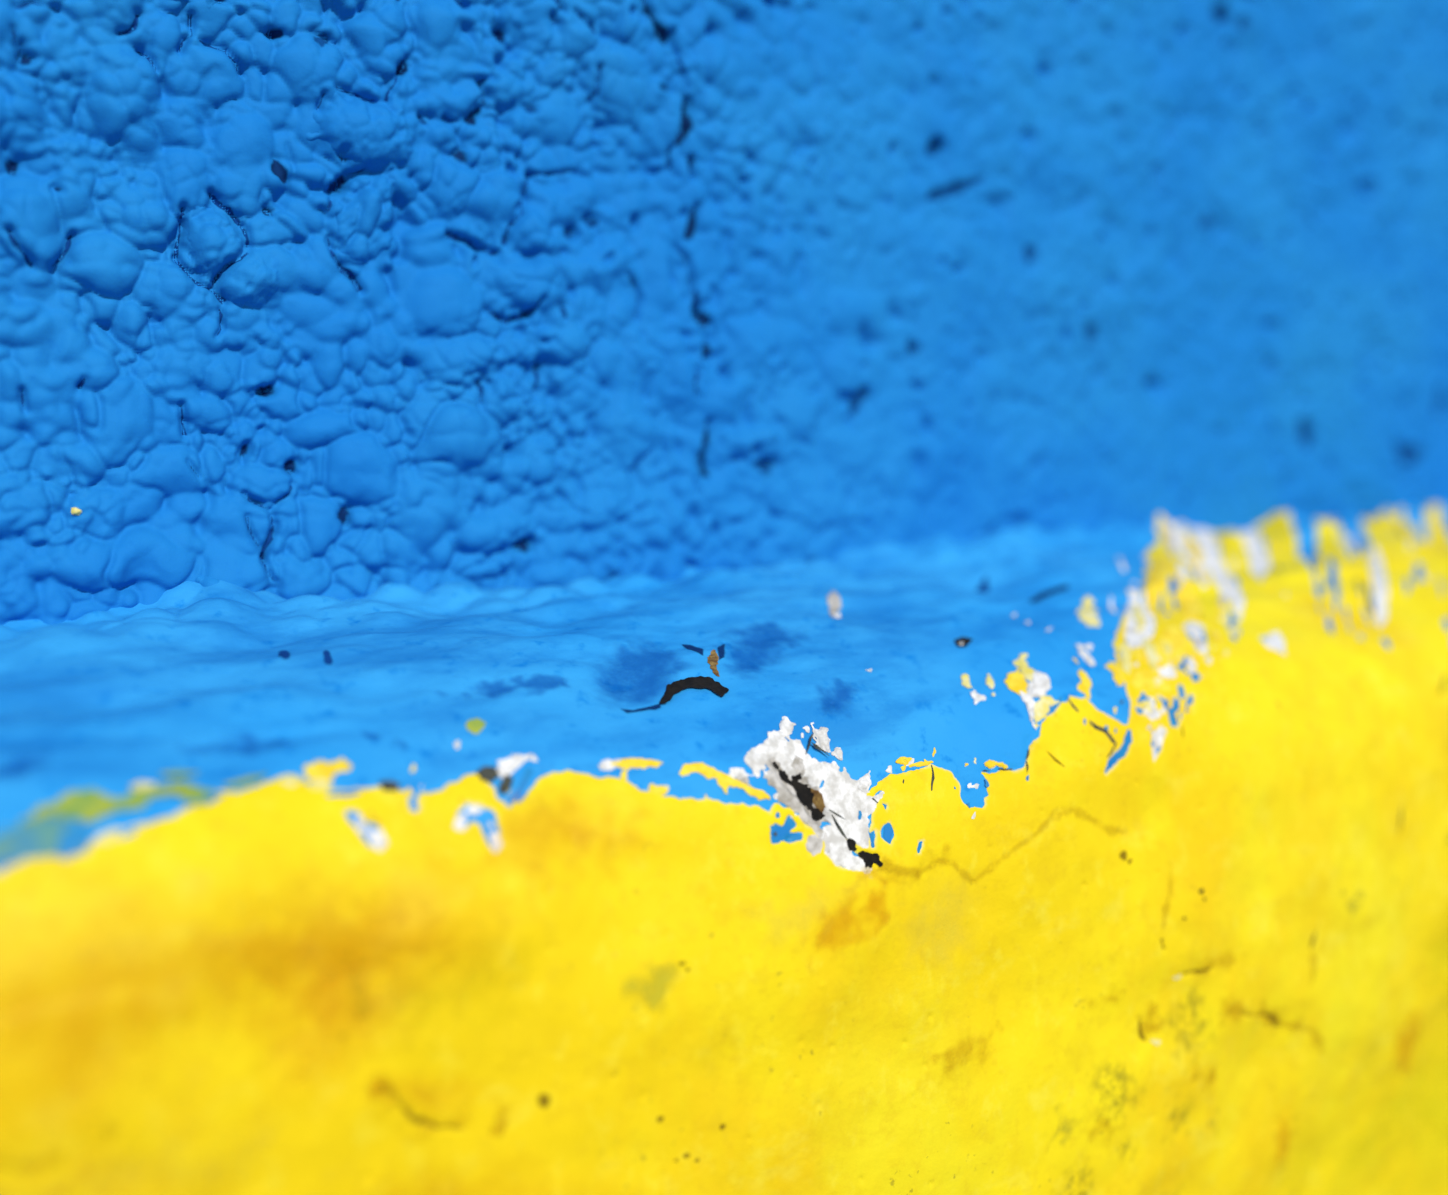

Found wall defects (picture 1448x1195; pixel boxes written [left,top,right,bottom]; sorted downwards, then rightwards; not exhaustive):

peeling [1311,508,1444,649]
peeling [954,637,973,647]
peeling [961,514,1282,773]
peeling [1262,631,1286,655]
peeling [454,718,486,749]
peeling [303,757,352,790]
peeling [477,753,538,803]
spalling [598,716,936,874]
peeling [954,758,1008,819]
peeling [355,816,388,851]
peeling [453,805,502,853]
crack [1231,1007,1280,1026]